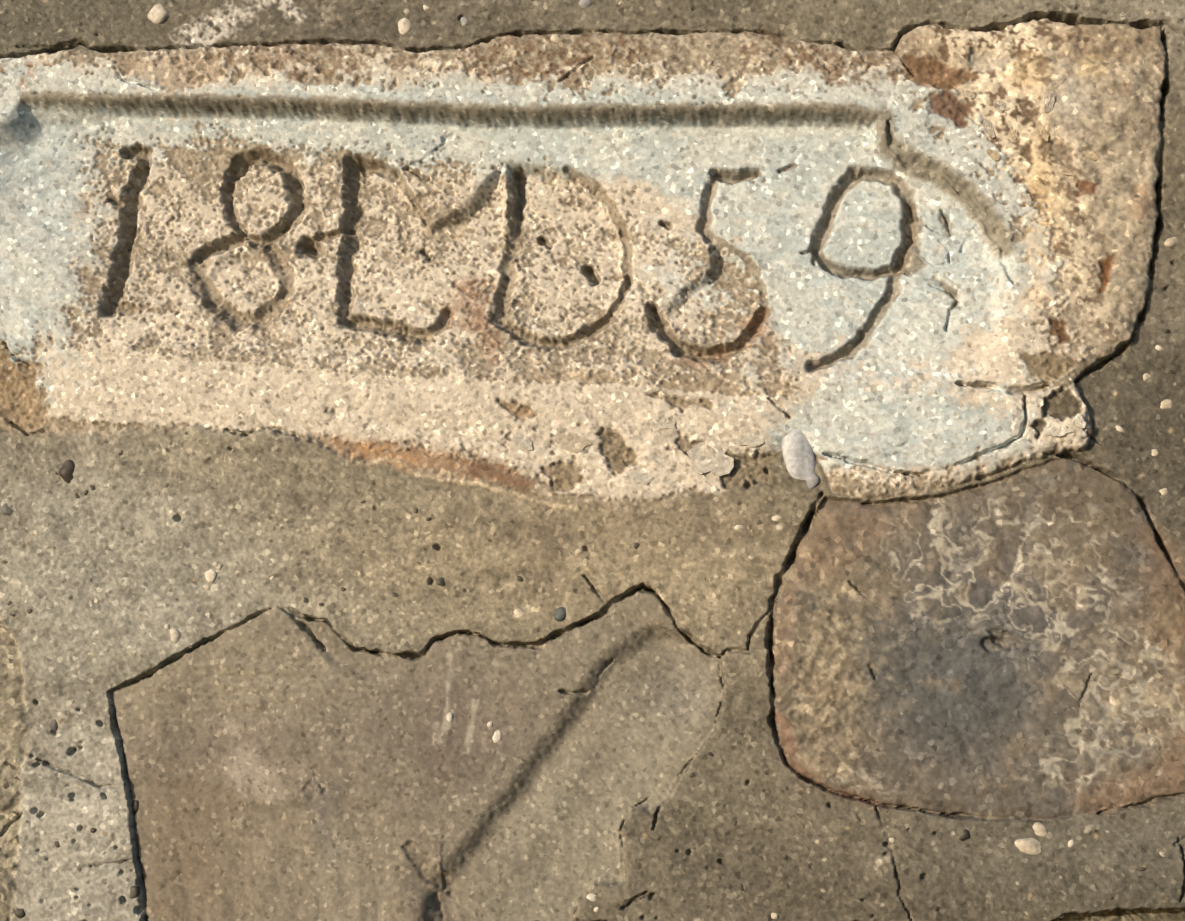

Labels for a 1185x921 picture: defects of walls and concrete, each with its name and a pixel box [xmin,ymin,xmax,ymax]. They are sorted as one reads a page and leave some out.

crack [0,11,1185,590]
spalling [0,343,49,431]
crack [36,491,983,921]
crack [1079,672,1126,736]
crack [0,811,24,839]
crack [1097,793,1185,817]
crack [1173,834,1185,904]